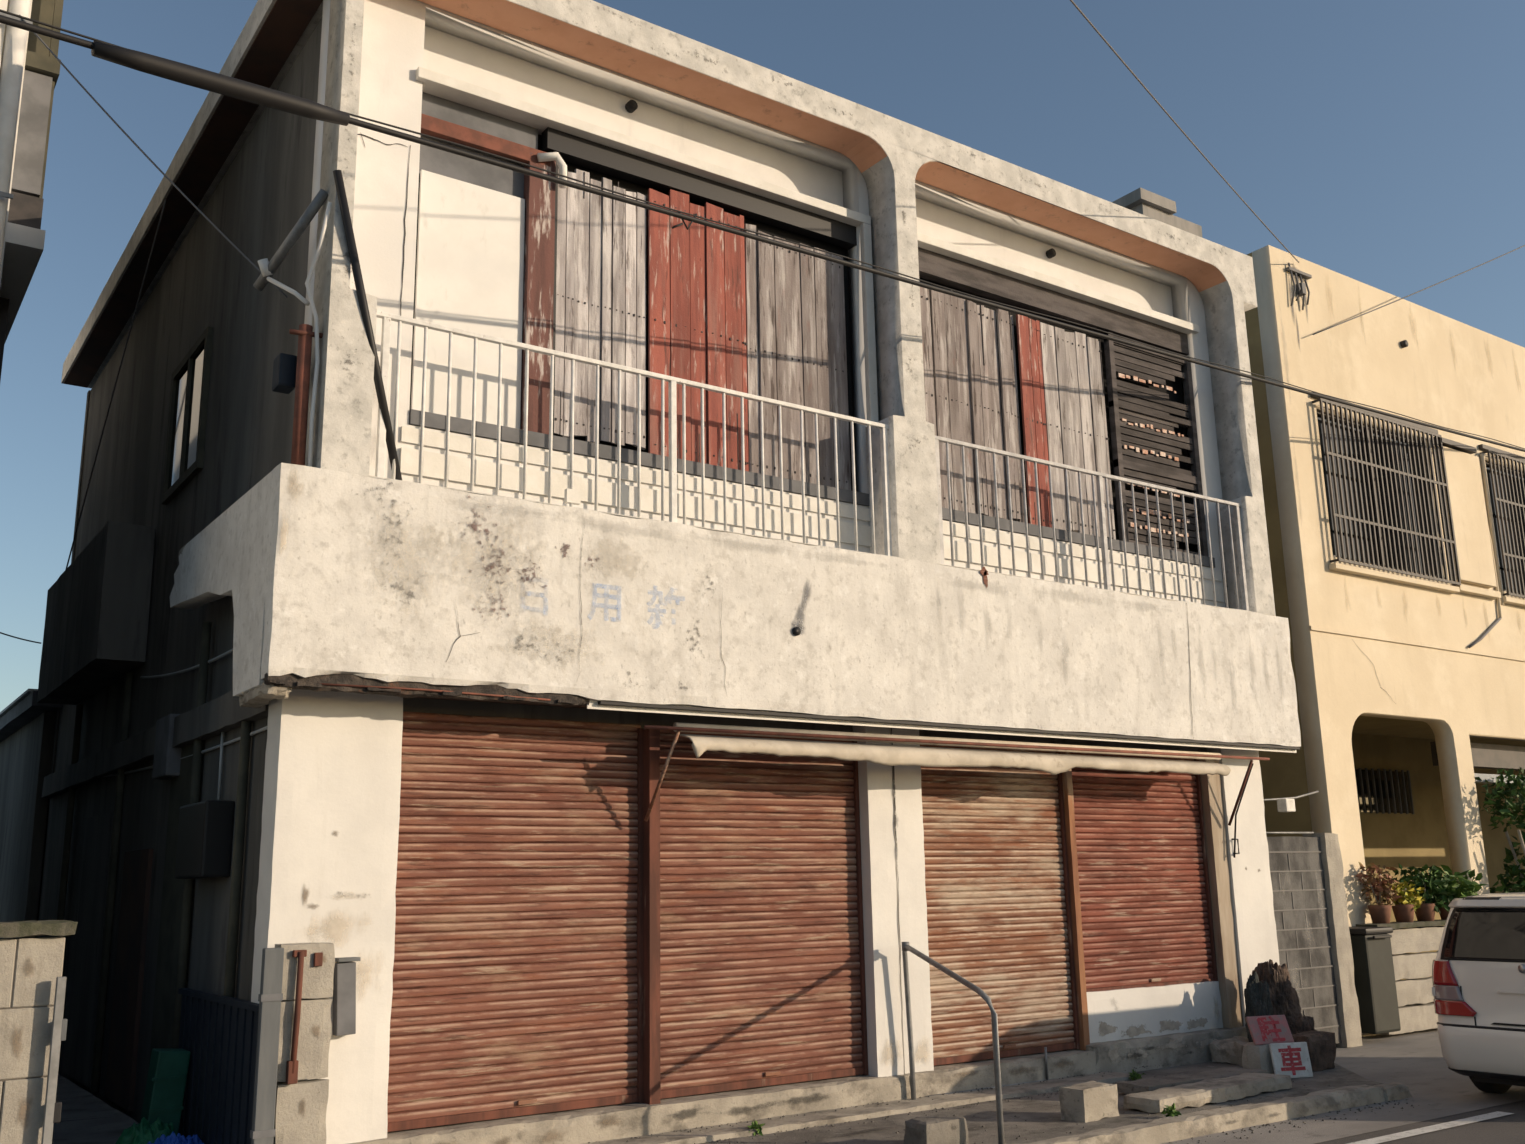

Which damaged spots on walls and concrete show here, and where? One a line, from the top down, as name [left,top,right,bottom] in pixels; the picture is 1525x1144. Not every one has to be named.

spalling [239,673,590,708]